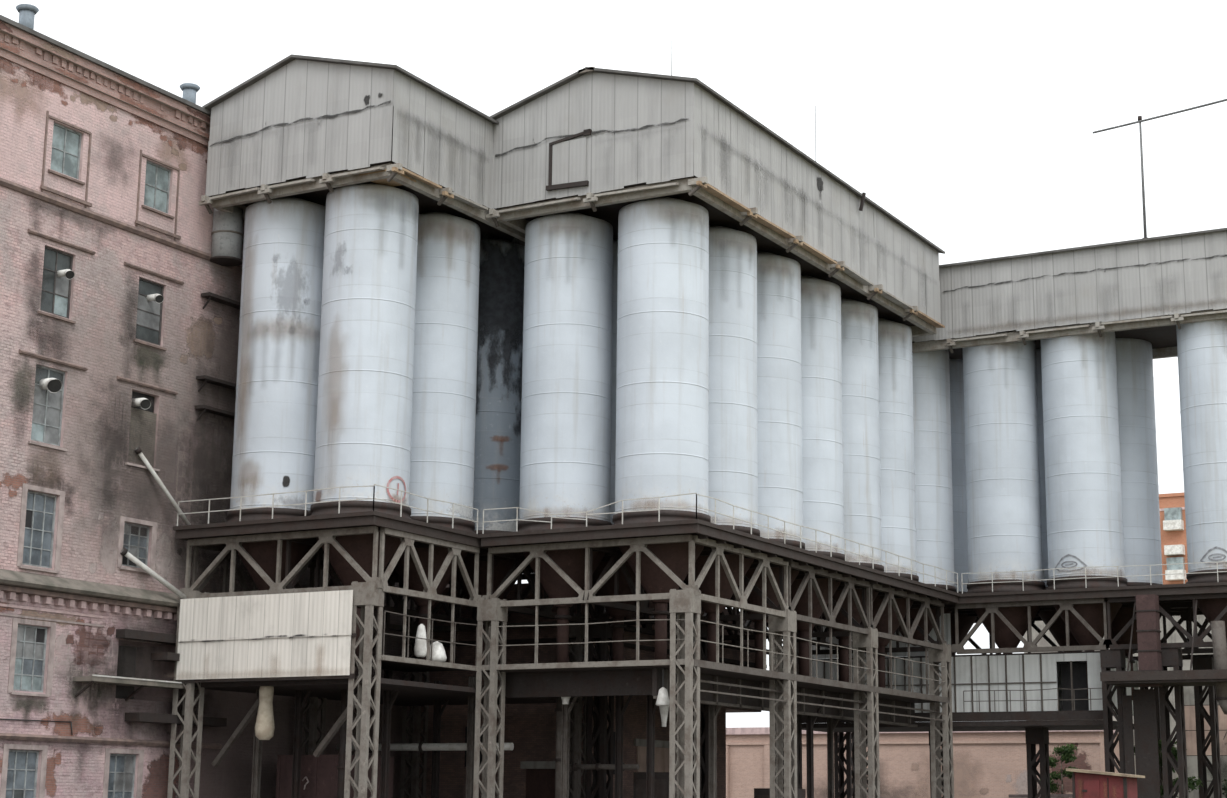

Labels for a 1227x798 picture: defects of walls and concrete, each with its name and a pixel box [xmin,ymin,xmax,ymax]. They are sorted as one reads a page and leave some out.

spalling [0,473,29,497]
spalling [0,602,115,667]
spalling [41,713,103,737]